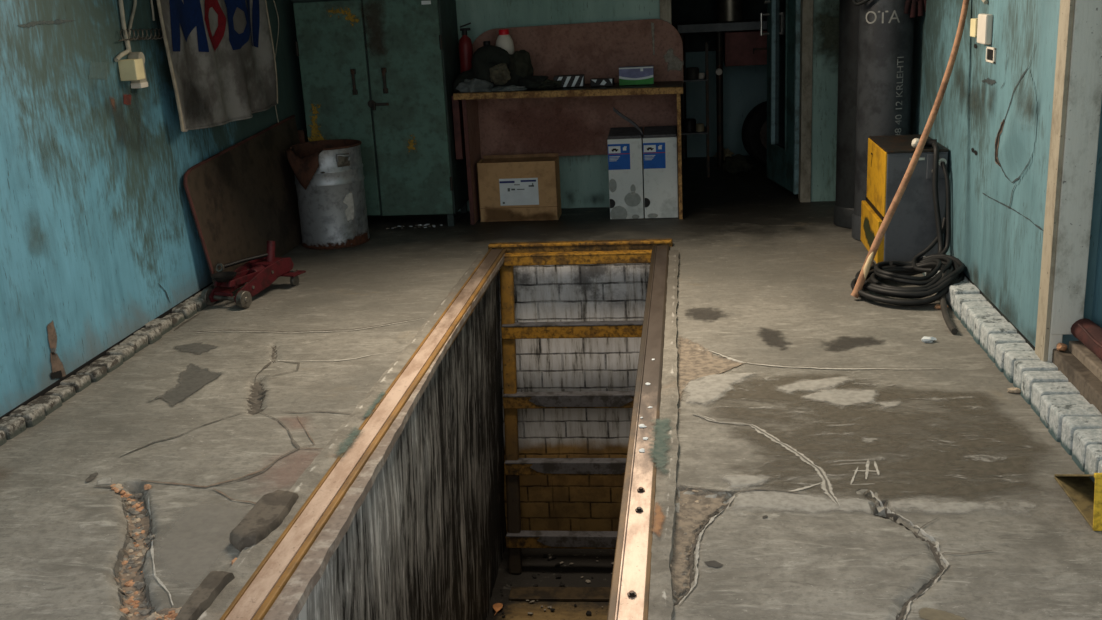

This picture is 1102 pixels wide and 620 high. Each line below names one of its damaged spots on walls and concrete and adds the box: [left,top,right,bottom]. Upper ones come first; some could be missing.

crack [982,43,1044,231]
spalling [149,343,222,406]
spalling [677,336,753,413]
crack [85,283,425,620]
crack [674,413,840,606]
spalling [670,475,1036,604]
crack [867,490,991,620]